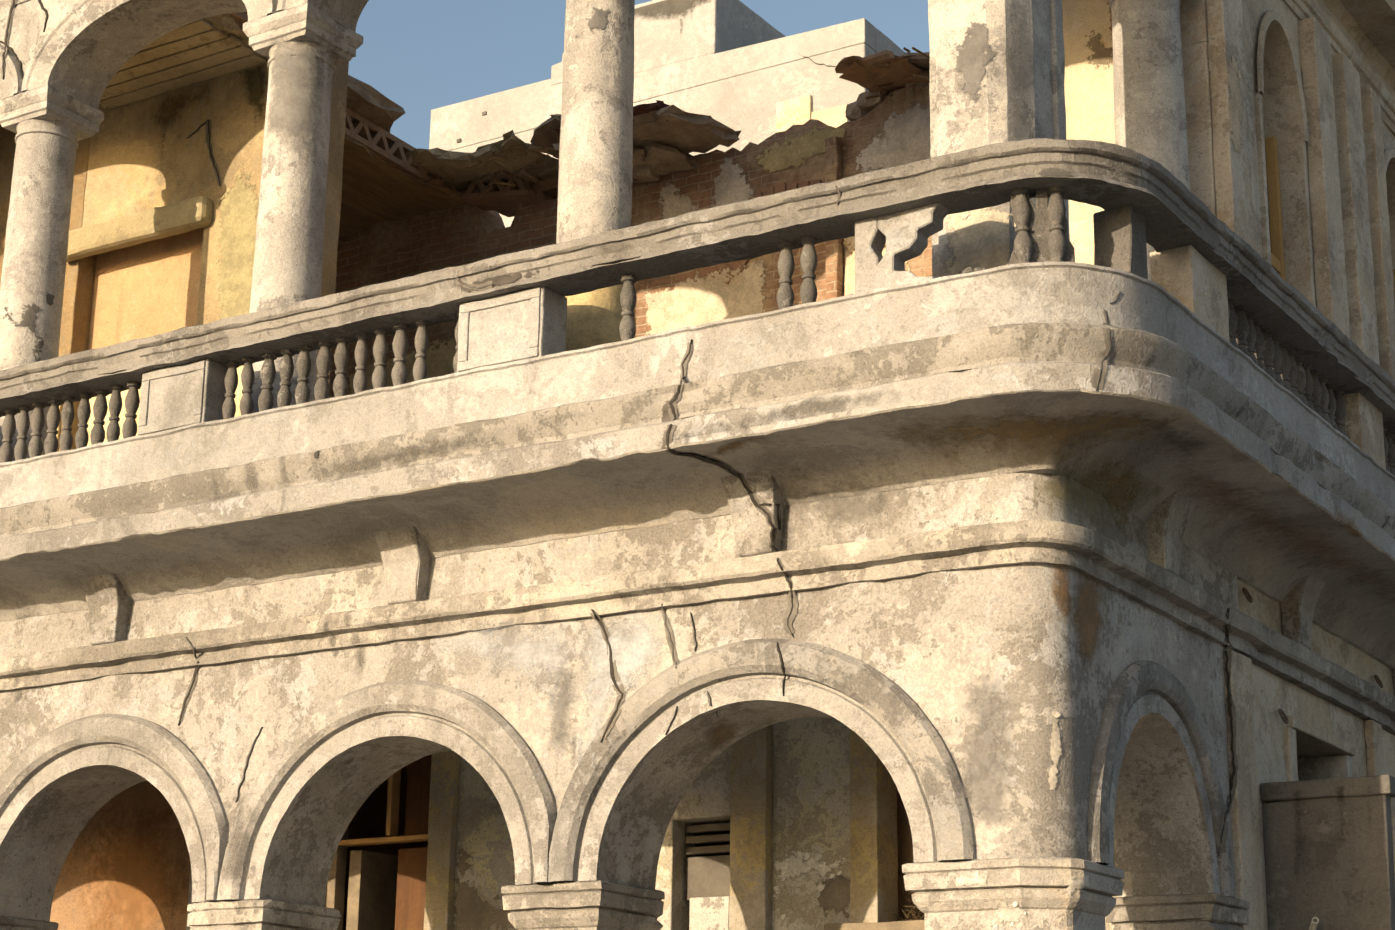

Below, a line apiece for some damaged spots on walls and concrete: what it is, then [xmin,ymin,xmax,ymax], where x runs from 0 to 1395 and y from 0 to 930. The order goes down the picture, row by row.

crack [0,0,49,80]
crack [186,119,222,186]
peeling [657,103,931,220]
flaking render [3,292,55,362]
crack [660,339,798,696]
crack [178,637,199,726]
crack [235,727,263,802]
crack [589,609,625,742]
crack [665,691,719,735]
crack [1216,608,1239,856]
peeling [453,848,518,930]
peeling [772,850,850,919]